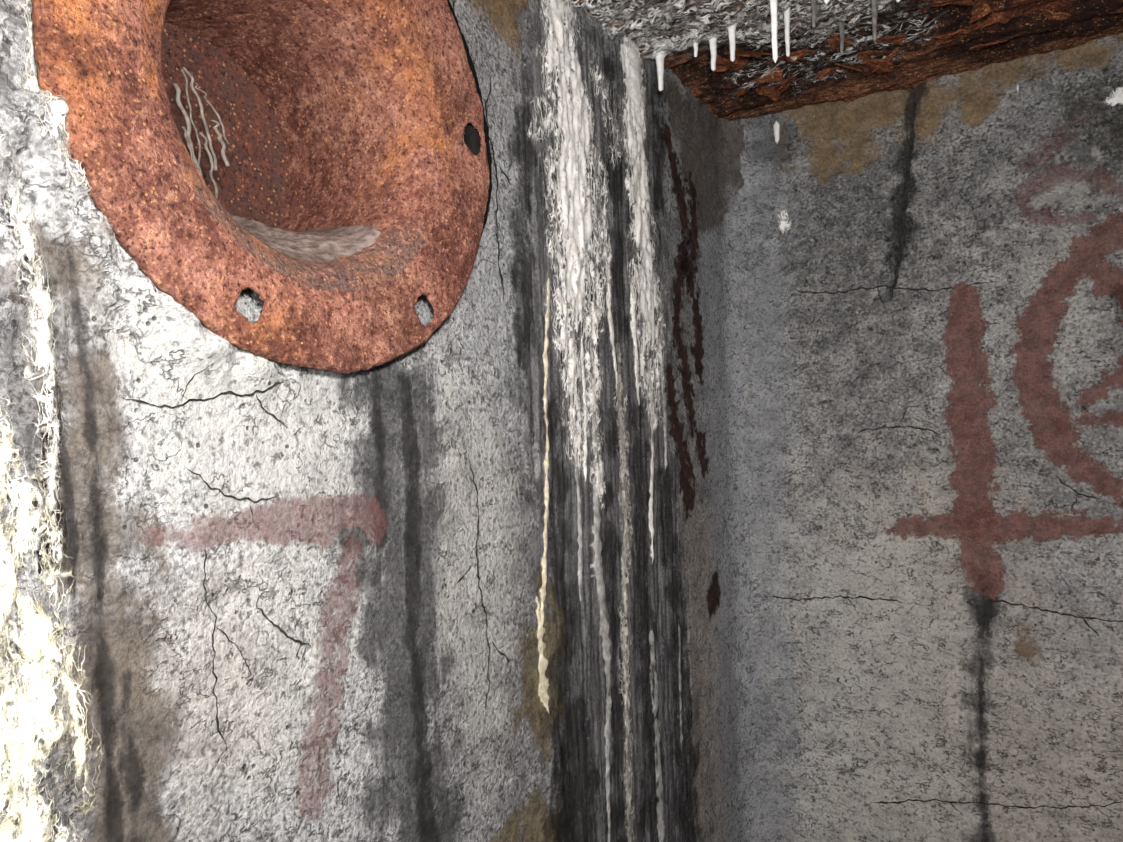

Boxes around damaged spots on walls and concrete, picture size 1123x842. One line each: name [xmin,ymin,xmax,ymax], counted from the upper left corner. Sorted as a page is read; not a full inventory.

rust [699,49,816,102]
rust [816,32,908,80]
rust [918,0,1023,50]
rust [1043,9,1071,21]
damp [1104,87,1123,106]
damp [770,41,1111,299]
rust [661,117,709,520]
crack [123,365,288,428]
damp [475,0,937,842]
damp [338,359,461,842]
damp [964,578,1000,842]